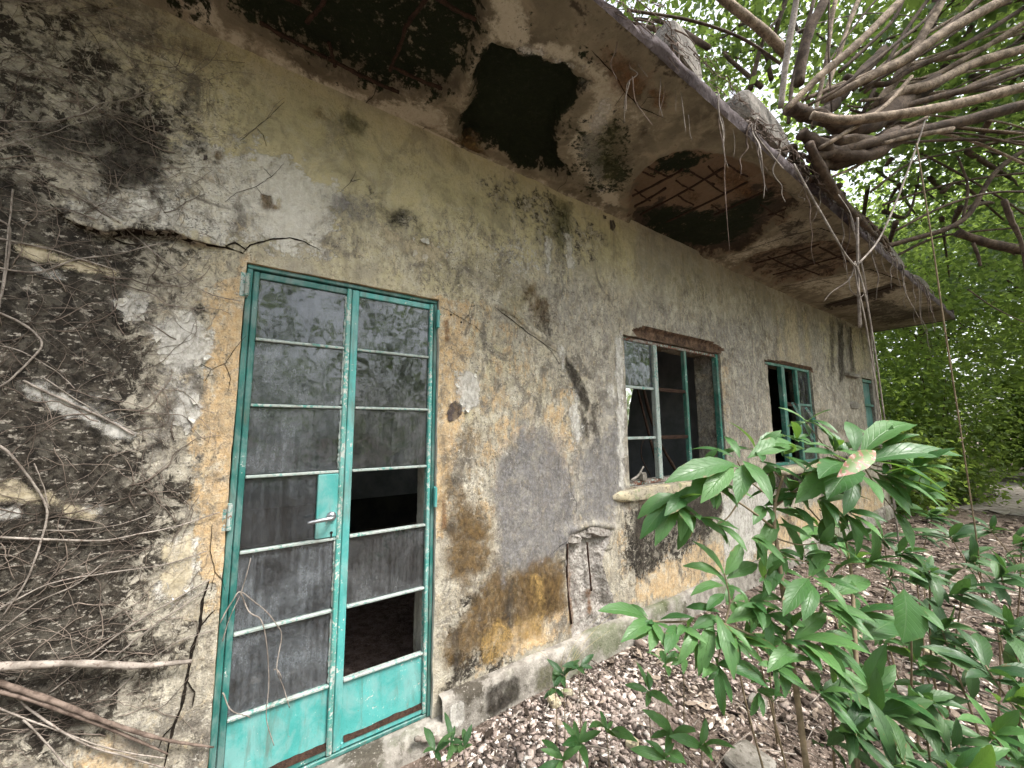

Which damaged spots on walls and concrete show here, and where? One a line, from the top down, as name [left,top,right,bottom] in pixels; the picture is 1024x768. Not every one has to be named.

water stain [37,106,162,202]
spalling [455,42,592,181]
crack [50,203,318,254]
water stain [545,197,574,274]
water stain [445,338,625,684]
flaking render [565,527,617,637]
water stain [635,506,665,578]
water stain [688,496,723,545]
crack [159,531,225,767]